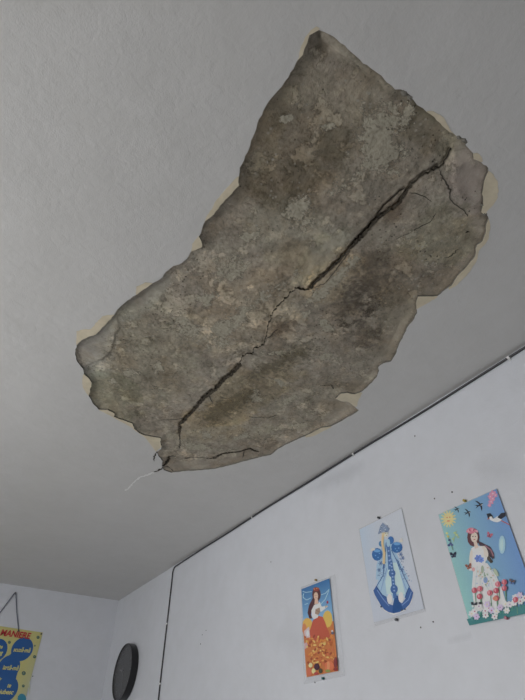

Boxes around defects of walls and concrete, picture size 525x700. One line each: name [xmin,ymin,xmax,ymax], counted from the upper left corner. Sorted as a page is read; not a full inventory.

flaking render [75,26,499,473]
crack [125,147,469,491]